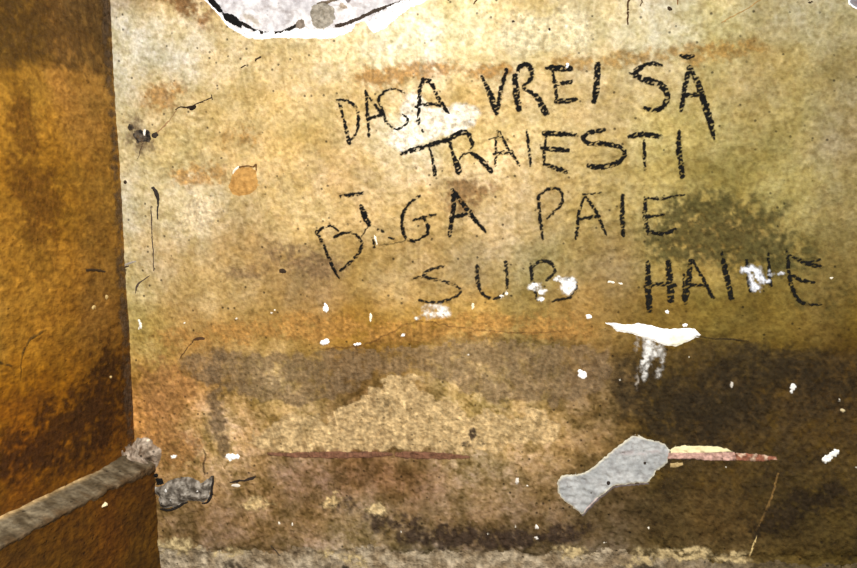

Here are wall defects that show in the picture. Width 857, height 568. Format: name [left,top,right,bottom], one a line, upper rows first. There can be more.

flaking render [205,0,426,40]
peeling [606,323,743,384]
water stain [0,348,126,484]
water stain [207,352,229,457]
spalling [154,455,214,512]
spalling [557,435,670,516]